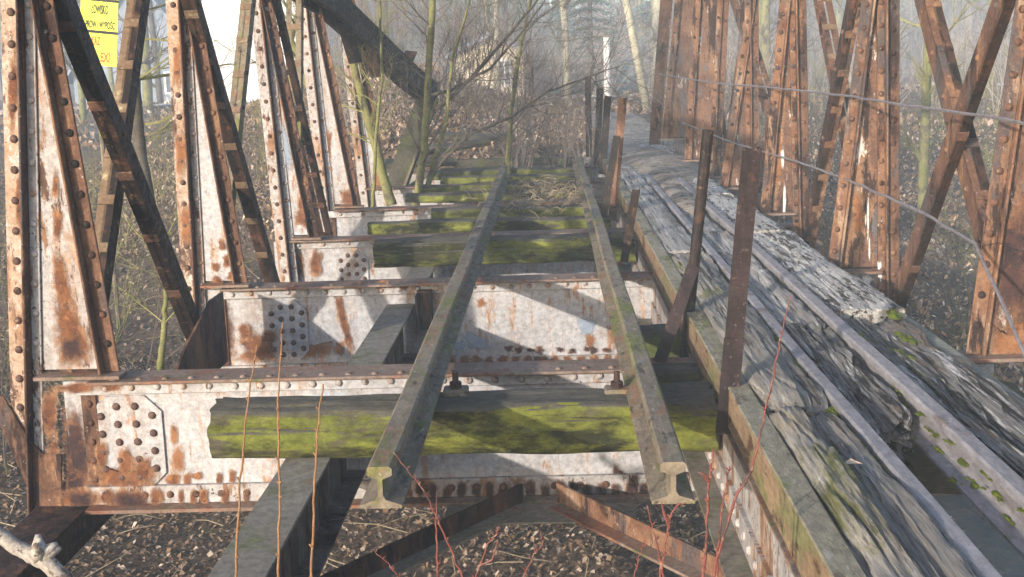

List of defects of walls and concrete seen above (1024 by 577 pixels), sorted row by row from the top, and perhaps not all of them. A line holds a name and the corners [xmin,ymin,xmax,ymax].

corrosion [852,189,866,238]
corrosion [52,172,91,369]
corrosion [226,305,278,364]
corrosion [303,296,354,359]
corrosion [449,330,618,363]
corrosion [41,382,235,507]
corrosion [415,466,648,498]